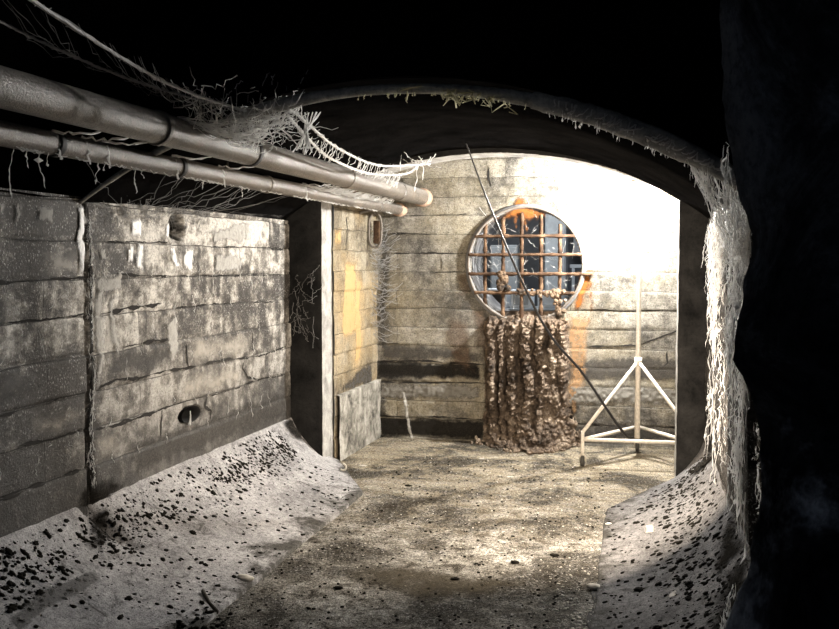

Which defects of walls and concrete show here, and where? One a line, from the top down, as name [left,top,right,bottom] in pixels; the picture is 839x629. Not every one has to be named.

crack [0,208,286,501]
corrosion [499,197,543,229]